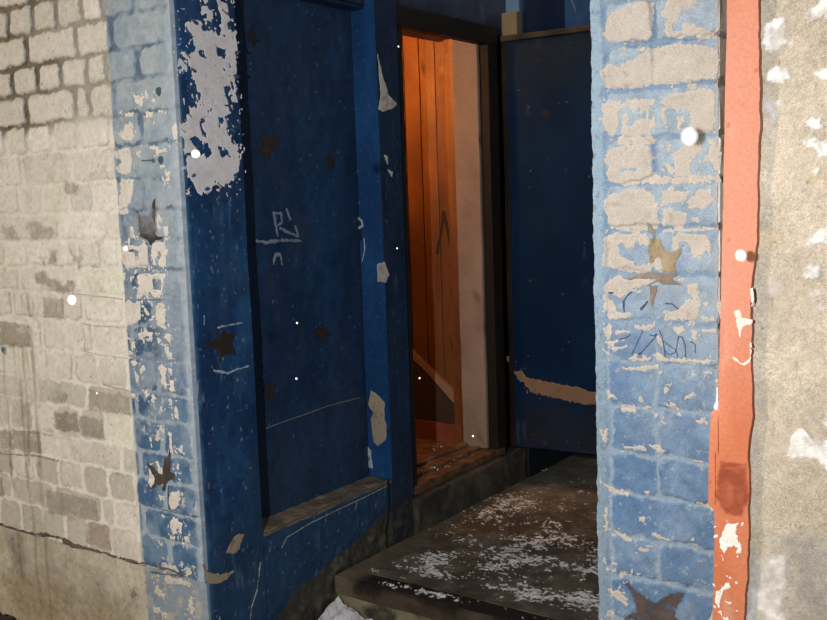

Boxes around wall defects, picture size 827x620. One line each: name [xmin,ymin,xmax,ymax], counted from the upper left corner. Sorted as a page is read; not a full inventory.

flaking render [377,54,397,112]
peeling [595,0,722,410]
peeling [54,0,246,487]
flaking render [377,262,389,283]
peeling [734,310,753,337]
flaking render [368,391,387,469]
peeling [607,389,667,425]
peeling [621,444,665,453]
crack [0,523,183,577]
peeling [148,491,234,620]
flaking render [226,533,245,554]
peeling [714,521,744,558]